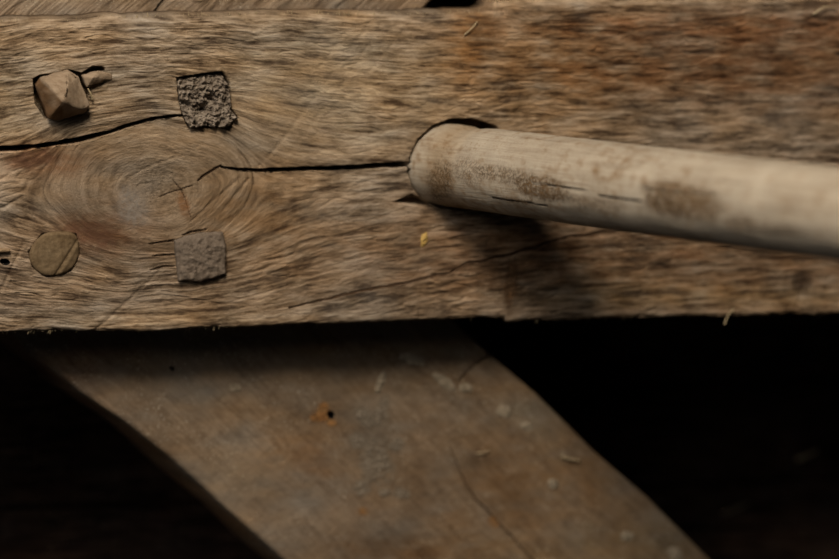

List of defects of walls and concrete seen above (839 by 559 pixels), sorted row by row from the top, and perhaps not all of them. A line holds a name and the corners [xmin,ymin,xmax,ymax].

crack [0,113,183,154]
crack [492,184,714,206]
crack [289,230,623,308]